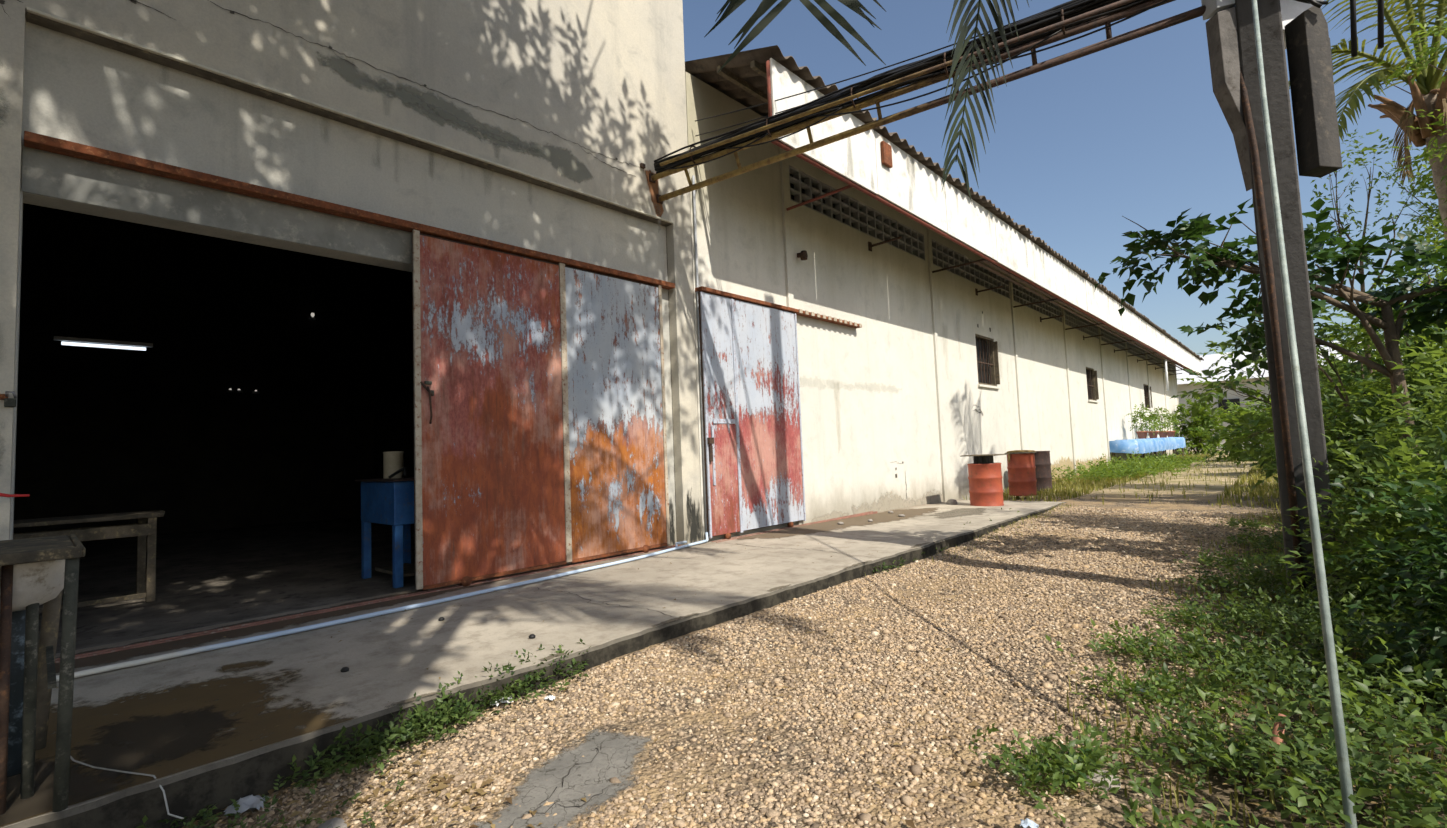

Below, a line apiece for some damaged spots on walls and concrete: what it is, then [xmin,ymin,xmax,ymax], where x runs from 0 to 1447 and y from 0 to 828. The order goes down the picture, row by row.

crack [208,0,636,177]
damp [0,661,356,827]